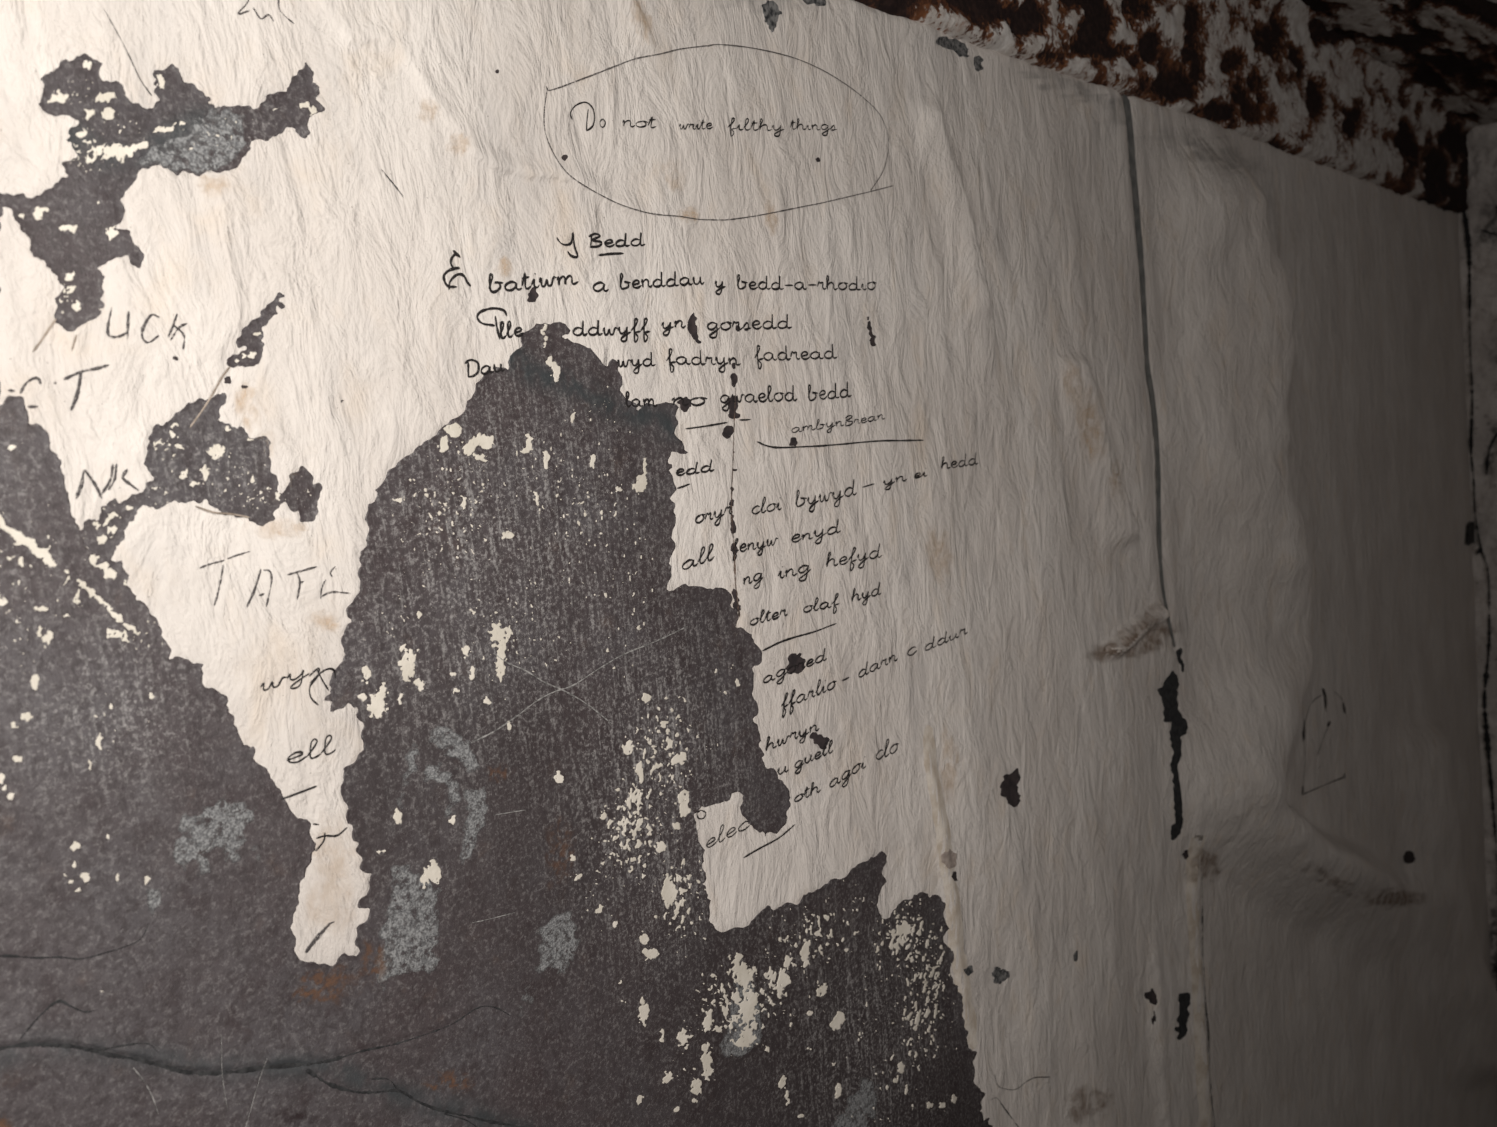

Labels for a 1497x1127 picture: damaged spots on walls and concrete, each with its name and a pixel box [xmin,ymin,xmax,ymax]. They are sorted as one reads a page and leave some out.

peeling [0,53,325,332]
spalling [527,287,539,302]
peeling [0,292,993,1127]
spalling [1000,768,1021,807]
crack [0,923,149,960]
spalling [992,967,1010,984]
crack [0,999,523,1127]